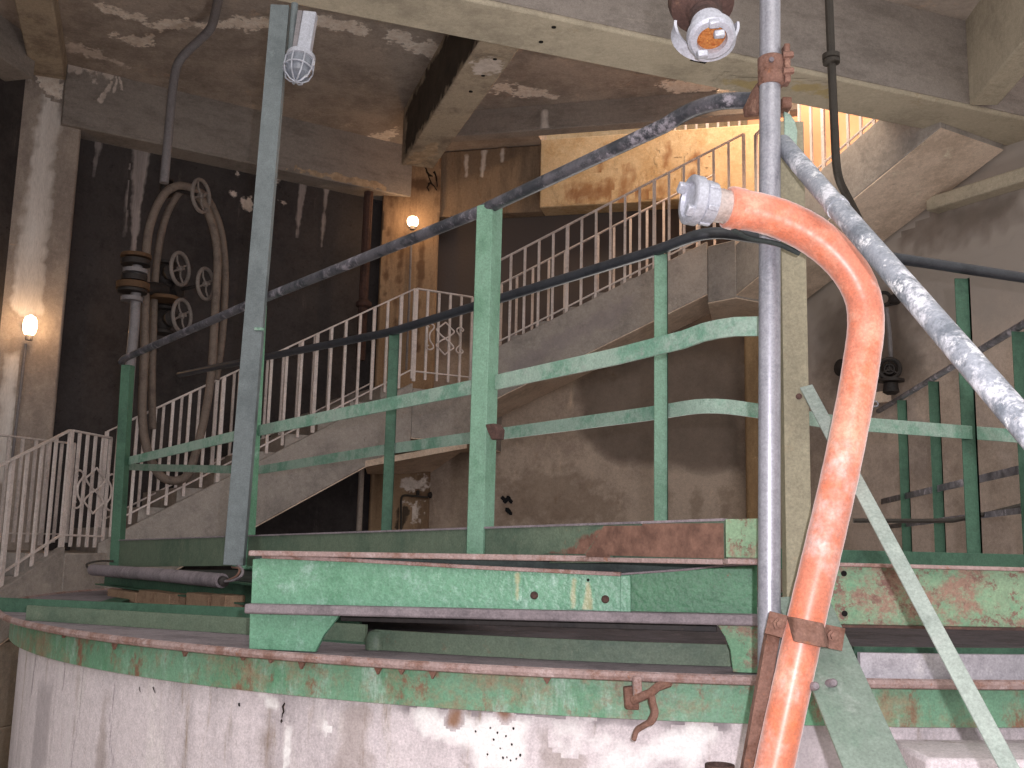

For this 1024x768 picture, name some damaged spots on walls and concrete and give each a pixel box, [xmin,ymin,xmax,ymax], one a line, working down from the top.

peeling [86,0,270,50]
peeling [487,77,563,101]
damp [4,35,136,320]
efflorescence [119,149,153,251]
efflorescence [293,183,308,240]
efflorescence [318,188,332,250]
corrosion [552,136,711,205]
damp [0,345,30,486]
spalling [394,472,431,528]
corrosion [541,523,724,559]
peeling [316,715,332,750]